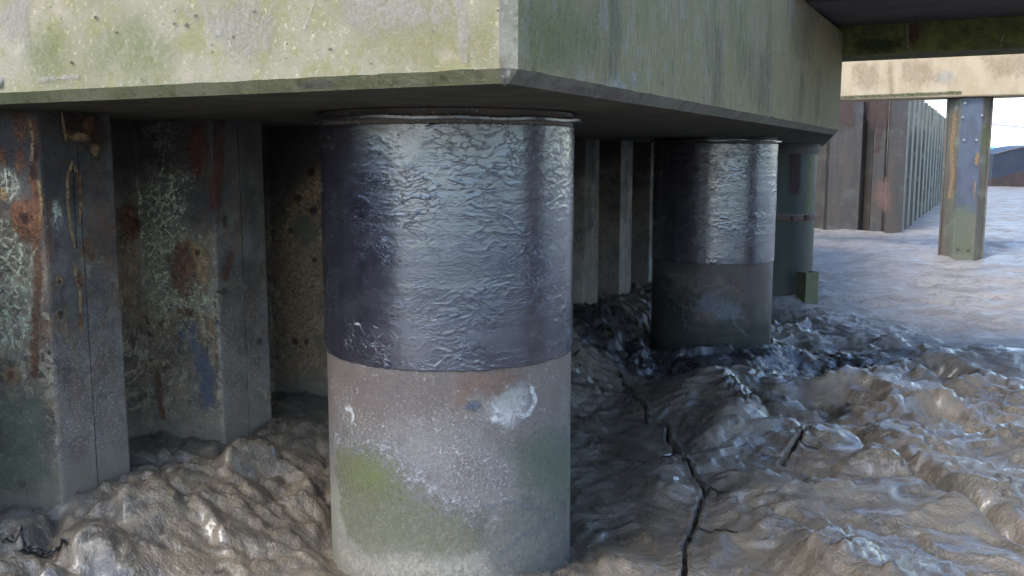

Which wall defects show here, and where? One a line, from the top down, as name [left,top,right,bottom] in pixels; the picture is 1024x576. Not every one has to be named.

rust [11,120,43,378]
rust [948,113,957,198]